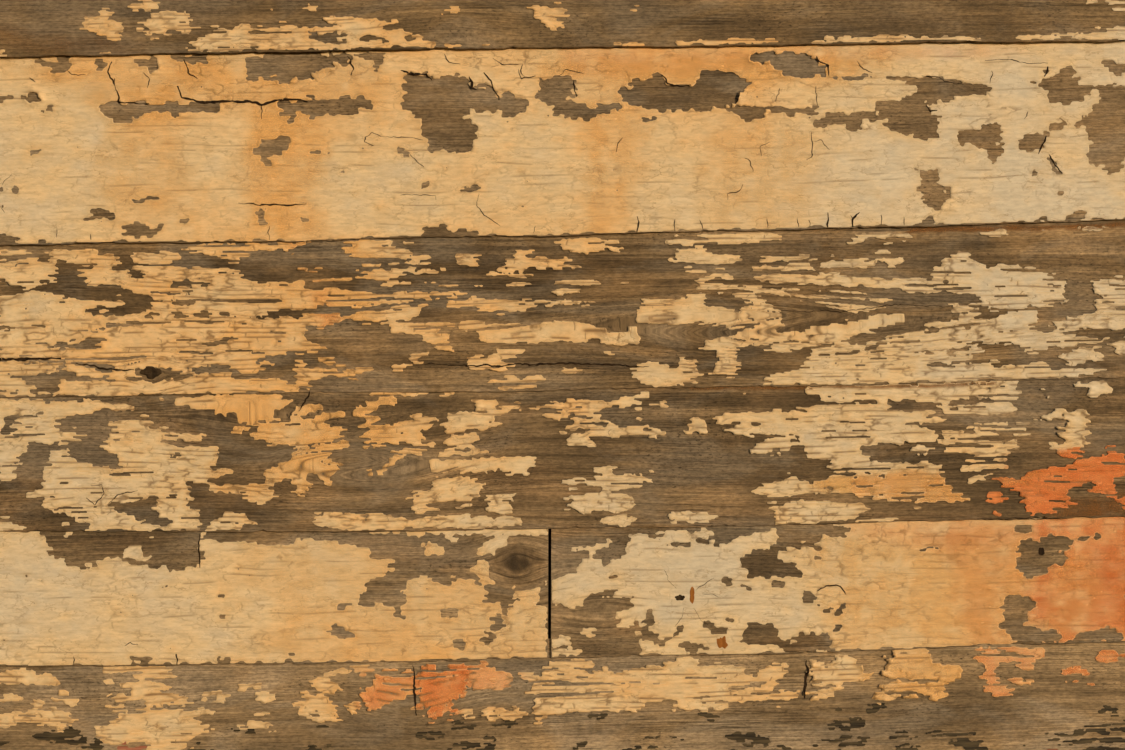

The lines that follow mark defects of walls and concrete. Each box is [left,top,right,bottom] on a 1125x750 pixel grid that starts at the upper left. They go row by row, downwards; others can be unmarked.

peeling [80,8,124,41]
peeling [127,0,201,40]
peeling [526,2,570,31]
peeling [1086,0,1125,11]
peeling [0,16,1125,287]
peeling [0,249,1125,750]